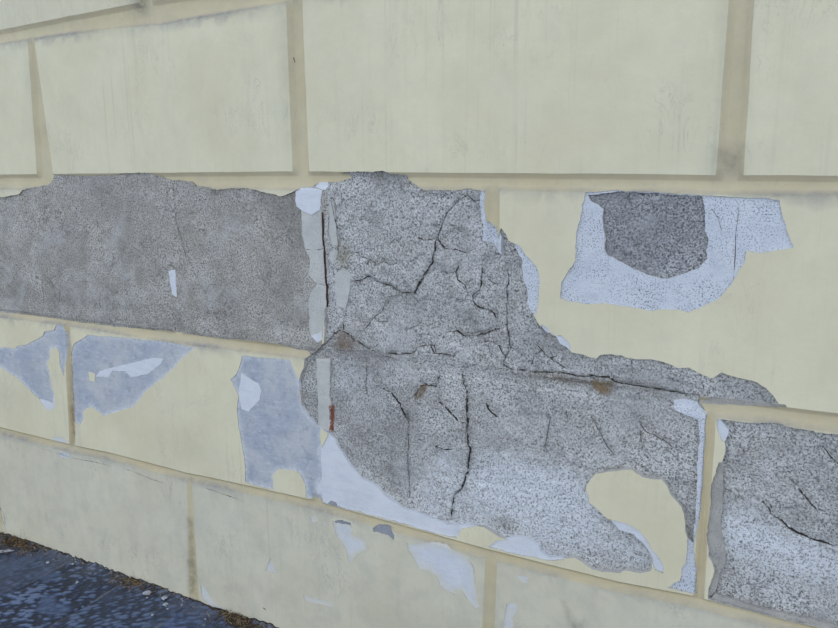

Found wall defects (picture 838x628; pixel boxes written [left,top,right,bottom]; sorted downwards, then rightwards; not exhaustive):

flaking render [0,173,838,628]
crack [306,195,693,520]
crack [762,501,832,545]